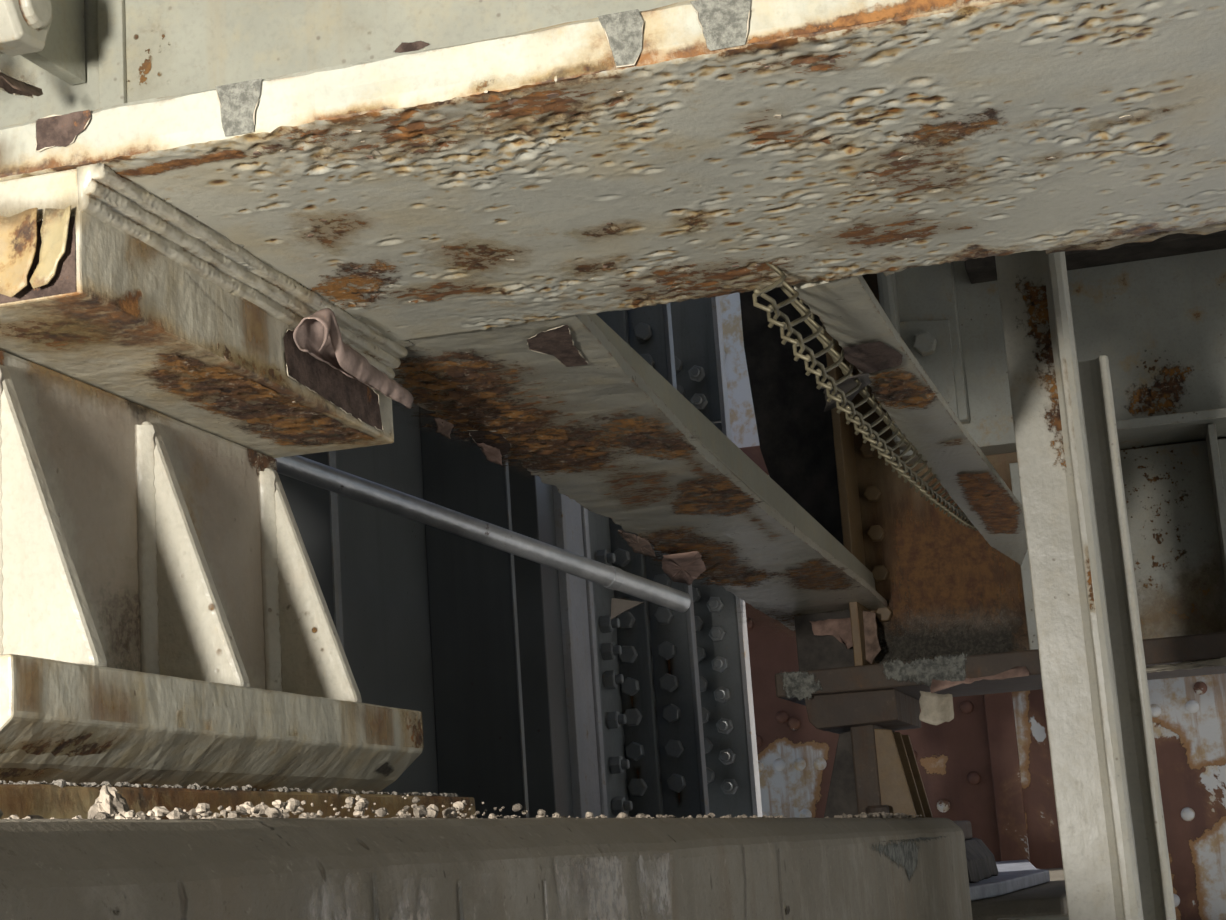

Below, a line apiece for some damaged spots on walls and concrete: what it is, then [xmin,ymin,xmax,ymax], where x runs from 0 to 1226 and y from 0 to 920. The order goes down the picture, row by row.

rust [739,0,984,74]
peeling [35,110,91,152]
rust [115,64,633,178]
rust [856,108,1008,199]
peeling [0,205,76,303]
peeling [283,308,413,433]
rust [394,350,860,591]
rust [810,472,1028,664]
peeling [1148,673,1226,770]
leakage [555,856,628,920]
leakage [639,854,671,914]
peeling [1189,816,1226,920]